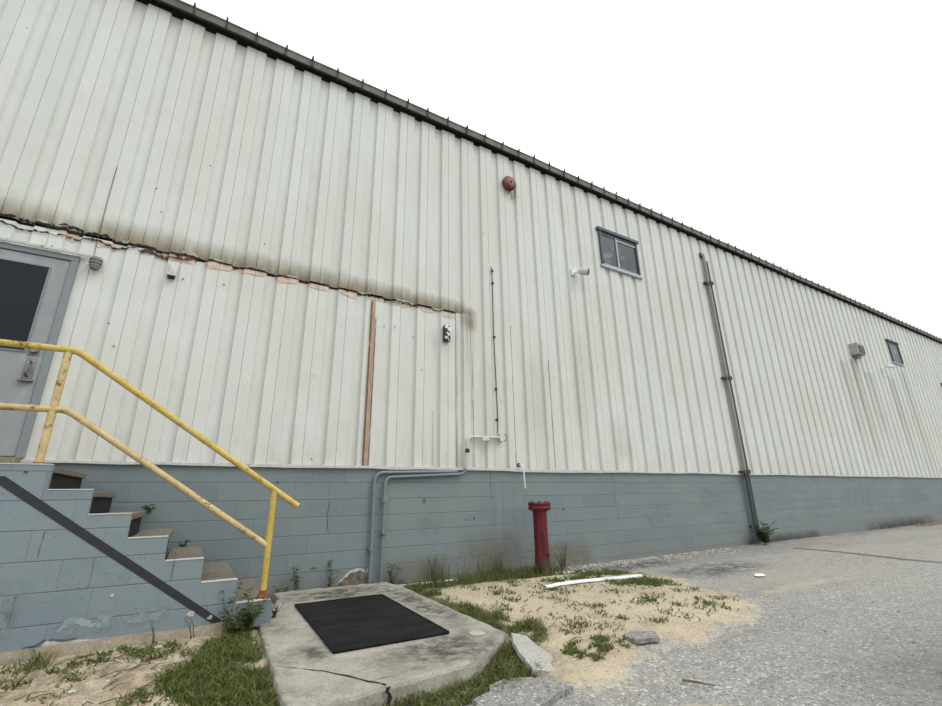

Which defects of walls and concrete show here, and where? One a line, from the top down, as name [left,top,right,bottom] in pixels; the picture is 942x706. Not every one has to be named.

peeling [0,215,456,318]
crack [275,665,393,706]